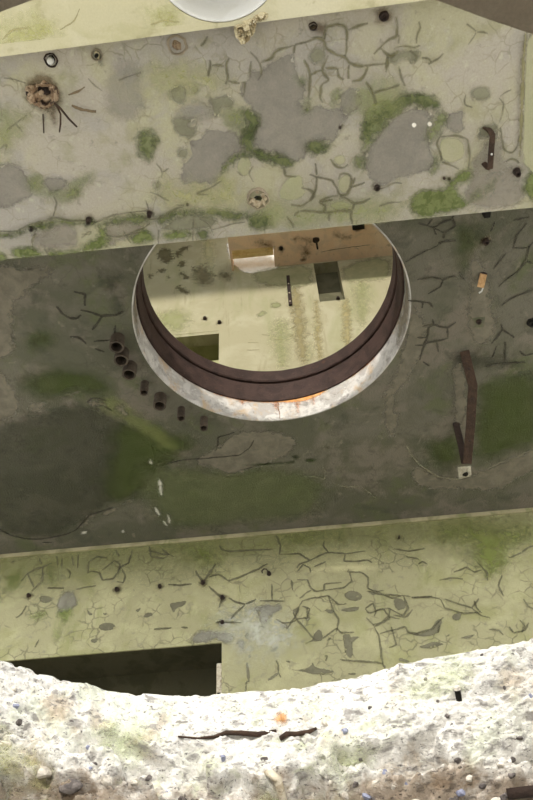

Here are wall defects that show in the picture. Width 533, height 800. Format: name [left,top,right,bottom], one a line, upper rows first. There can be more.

crack [68,82,98,113]
spalling [234,12,268,45]
peeling [169,54,362,184]
crack [201,17,443,104]
peeling [363,107,464,184]
crack [500,32,527,163]
crack [283,159,402,228]
crack [408,272,464,366]
rust [276,391,324,406]
damp [0,407,320,535]
crack [1,507,174,618]
crack [168,536,533,675]